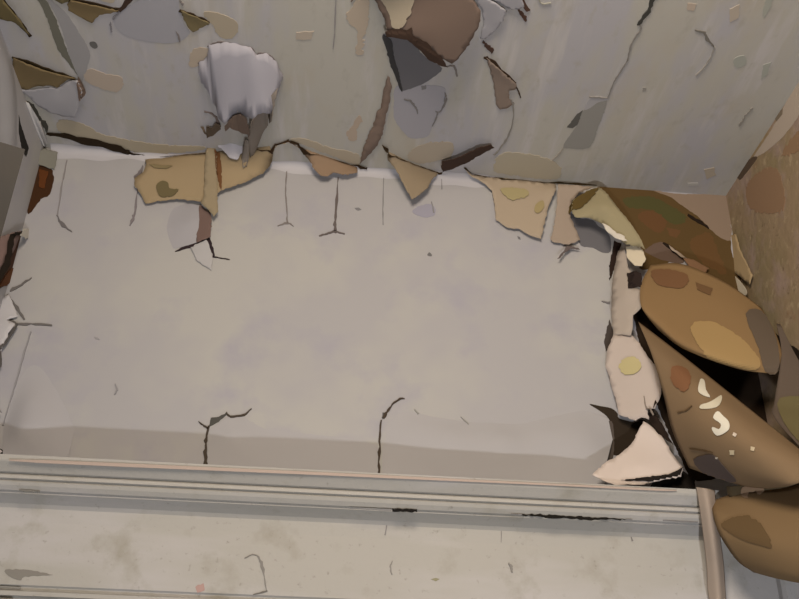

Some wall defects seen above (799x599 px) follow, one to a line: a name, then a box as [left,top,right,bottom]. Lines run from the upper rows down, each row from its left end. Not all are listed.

peeling [0,0,30,35]
crack [333,0,353,48]
crack [589,0,655,99]
crack [695,29,715,76]
peeling [12,0,210,214]
flaking render [737,83,799,180]
peeling [0,231,21,350]
crack [0,231,52,426]
peeling [134,0,767,599]
crack [198,408,252,464]
crack [377,398,419,473]